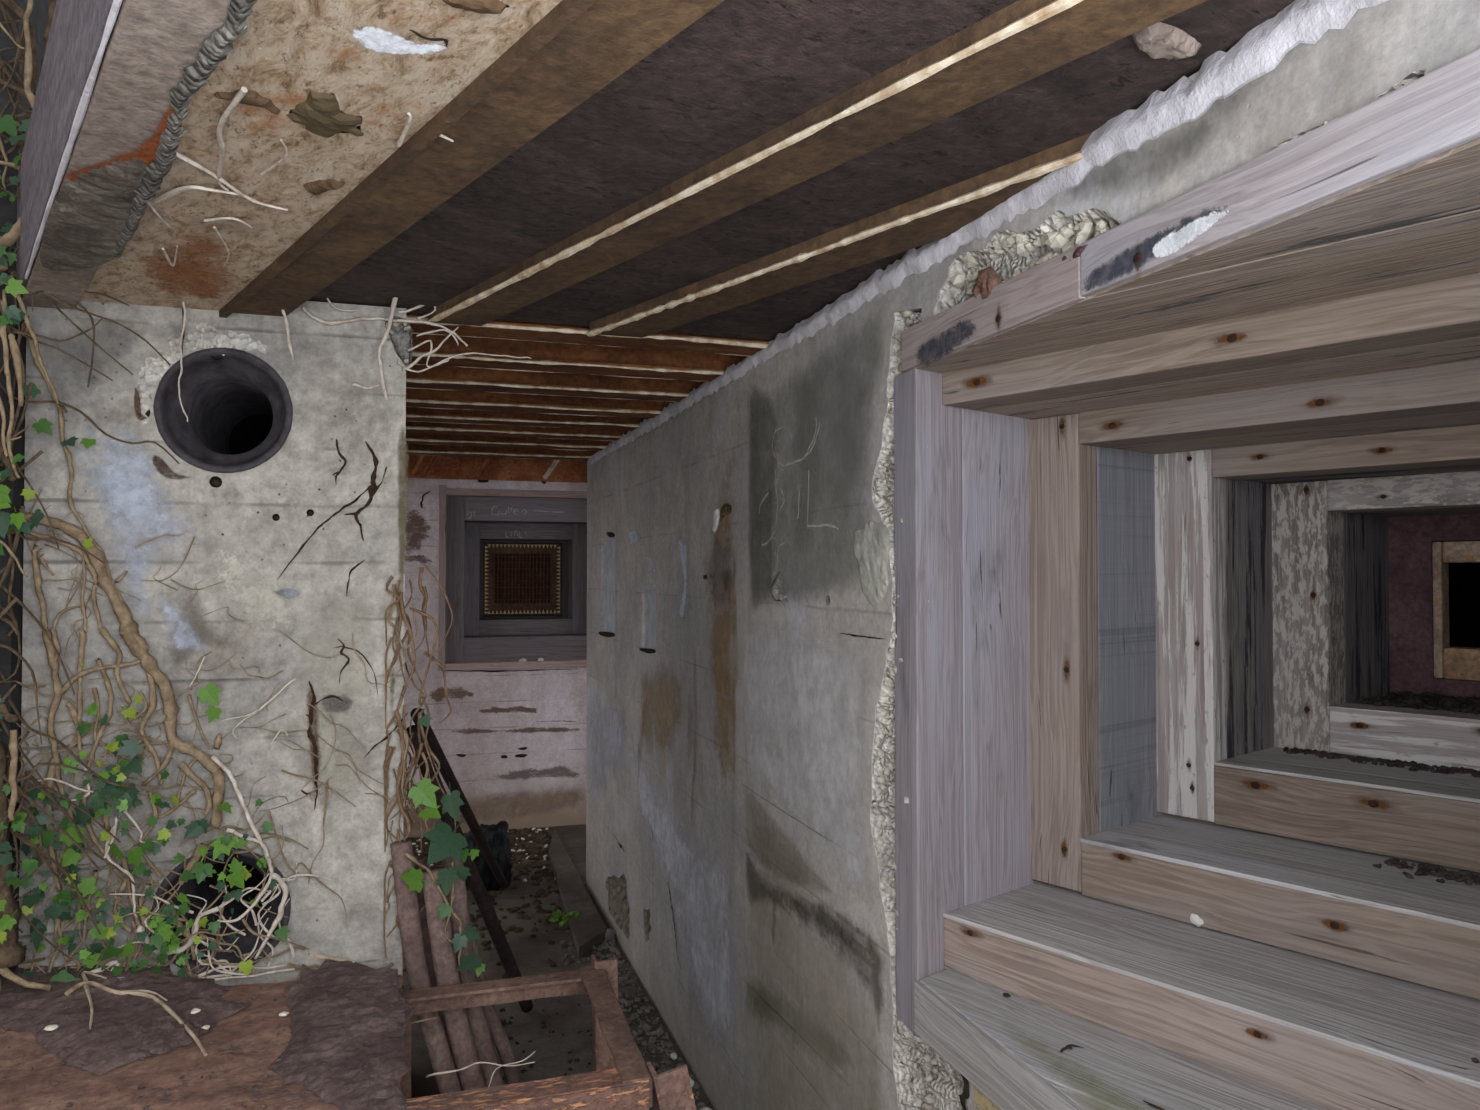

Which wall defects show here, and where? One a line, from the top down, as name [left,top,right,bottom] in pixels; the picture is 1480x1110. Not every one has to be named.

rust [66,107,174,181]
rust [148,237,223,298]
water stain [406,0,1083,460]
water stain [750,328,877,597]
peeling [429,687,579,779]
rust [712,504,732,766]
spalling [854,208,1122,1110]
water stain [592,701,731,1030]
water stain [746,856,882,1006]
crack [959,1073,970,1110]